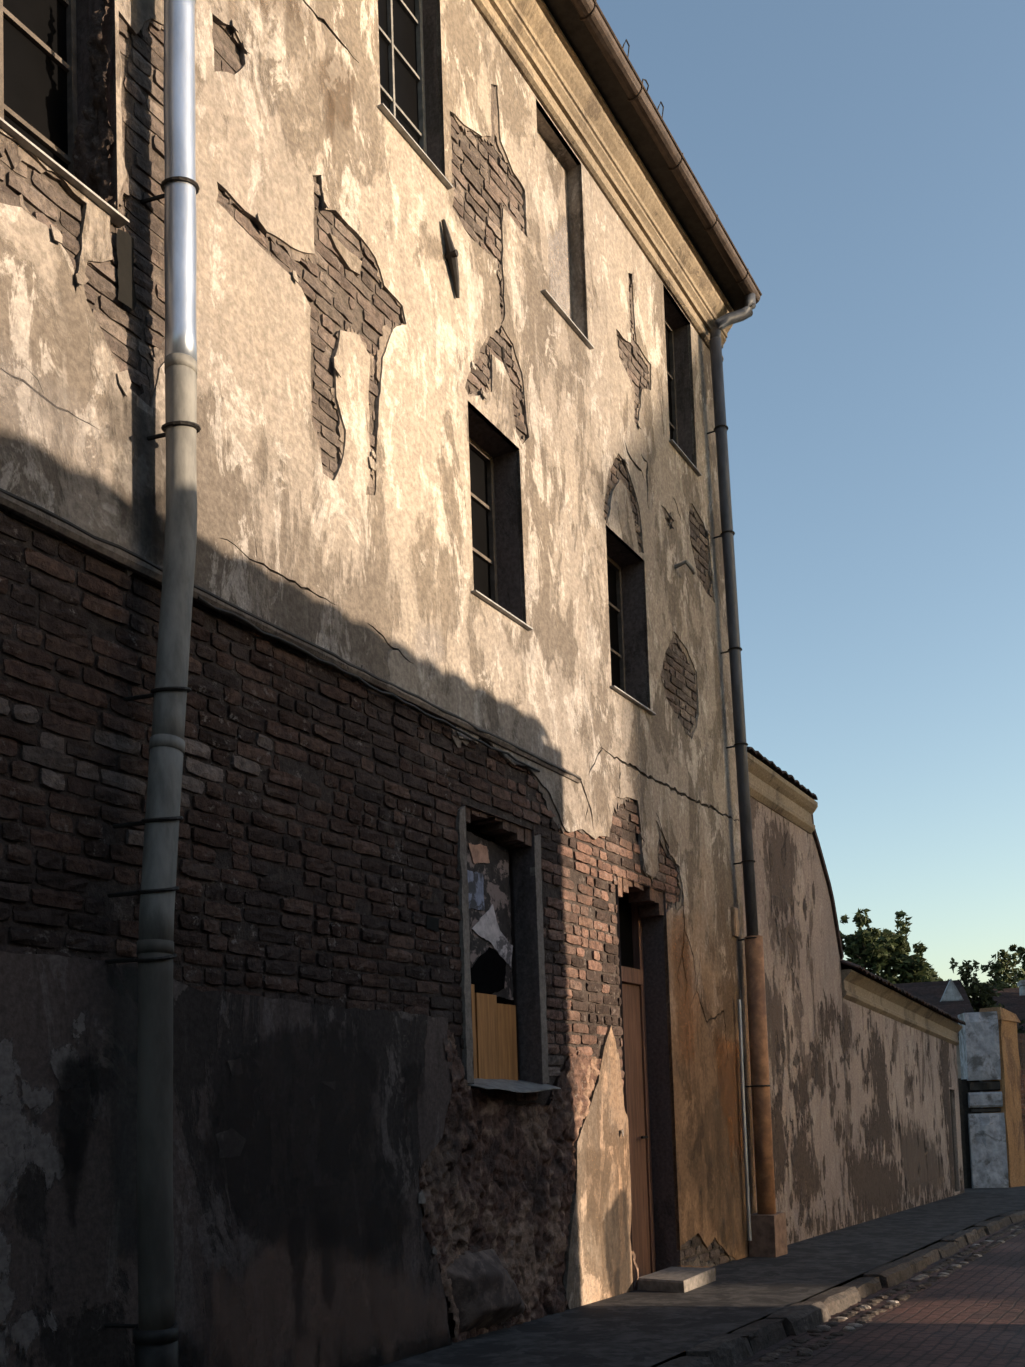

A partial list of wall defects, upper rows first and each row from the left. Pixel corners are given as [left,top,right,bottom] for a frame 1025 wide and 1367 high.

flaking render [0,507,162,965]
flaking render [0,0,165,407]
flaking render [217,177,405,495]
flaking render [450,85,527,444]
flaking render [604,455,642,552]
flaking render [616,275,650,429]
crack [613,757,735,821]
flaking render [660,633,697,738]
flaking render [661,504,714,602]
flaking render [173,600,682,1343]
damp [58,1054,96,1224]
damp [178,1020,452,1367]